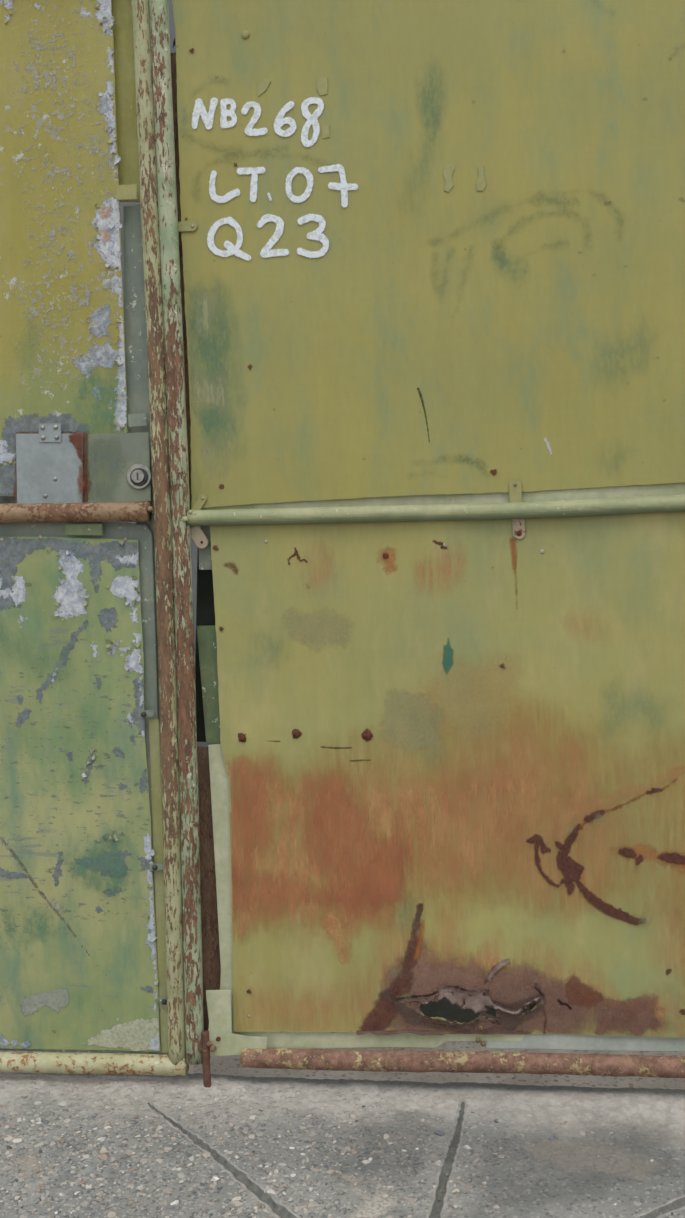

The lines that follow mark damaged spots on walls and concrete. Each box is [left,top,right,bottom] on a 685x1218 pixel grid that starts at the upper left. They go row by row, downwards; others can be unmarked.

peeling [0,0,128,431]
peeling [0,413,89,496]
peeling [0,537,145,758]
peeling [0,1034,31,1049]
peeling [21,988,69,1017]
peeling [52,833,160,1051]
rust [362,903,665,1036]